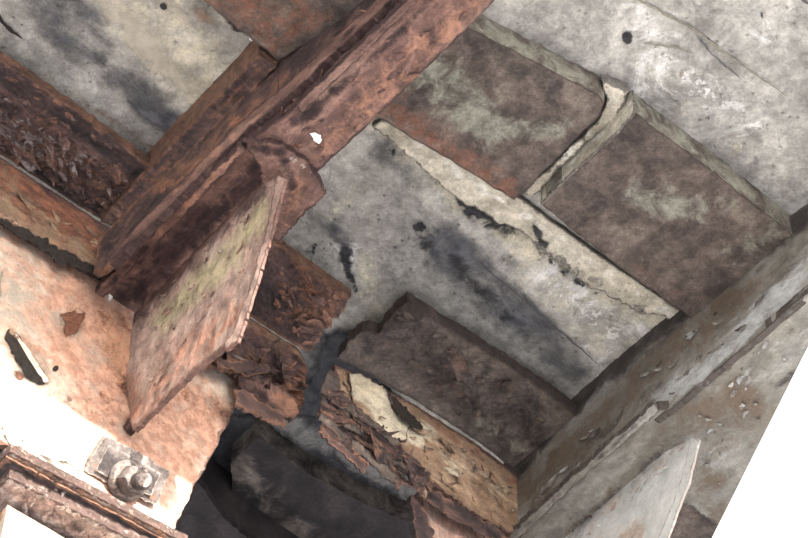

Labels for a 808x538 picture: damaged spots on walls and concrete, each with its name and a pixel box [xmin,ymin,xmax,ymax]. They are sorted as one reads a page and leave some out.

damp [33,0,192,93]
damp [103,70,180,132]
damp [319,217,347,243]
corrosion [60,308,86,337]
damp [420,226,586,380]